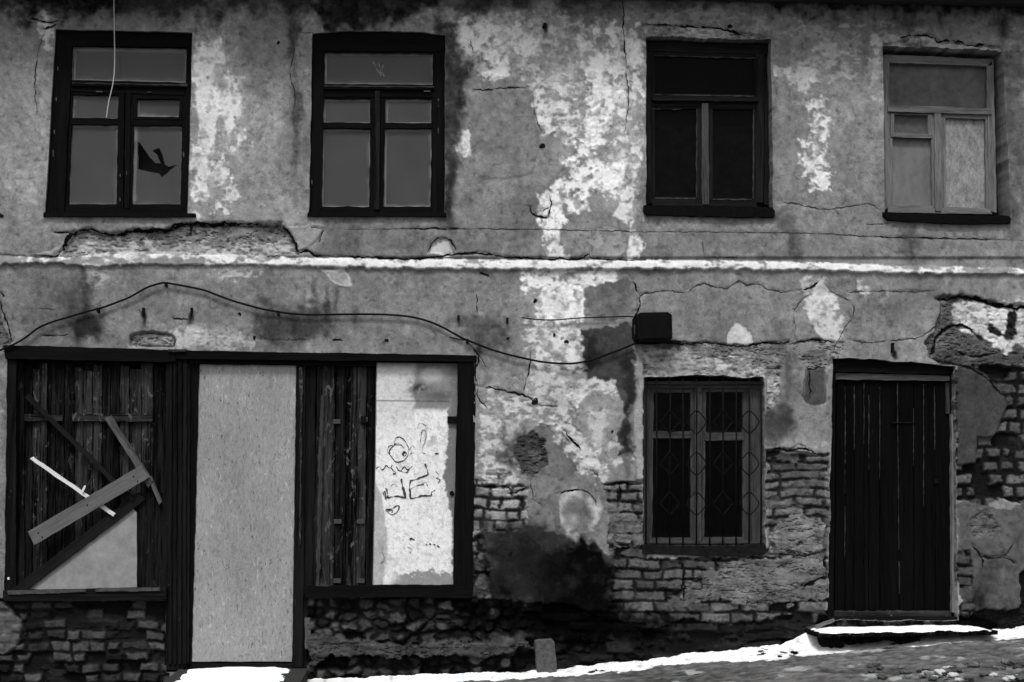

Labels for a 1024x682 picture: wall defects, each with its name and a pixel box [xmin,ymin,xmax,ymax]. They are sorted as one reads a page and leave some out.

peeling [28,33,325,291]
crack [622,0,747,131]
crack [33,199,1024,408]
leakage [579,322,637,457]
flaking render [307,2,1024,670]
flaking render [0,602,24,655]